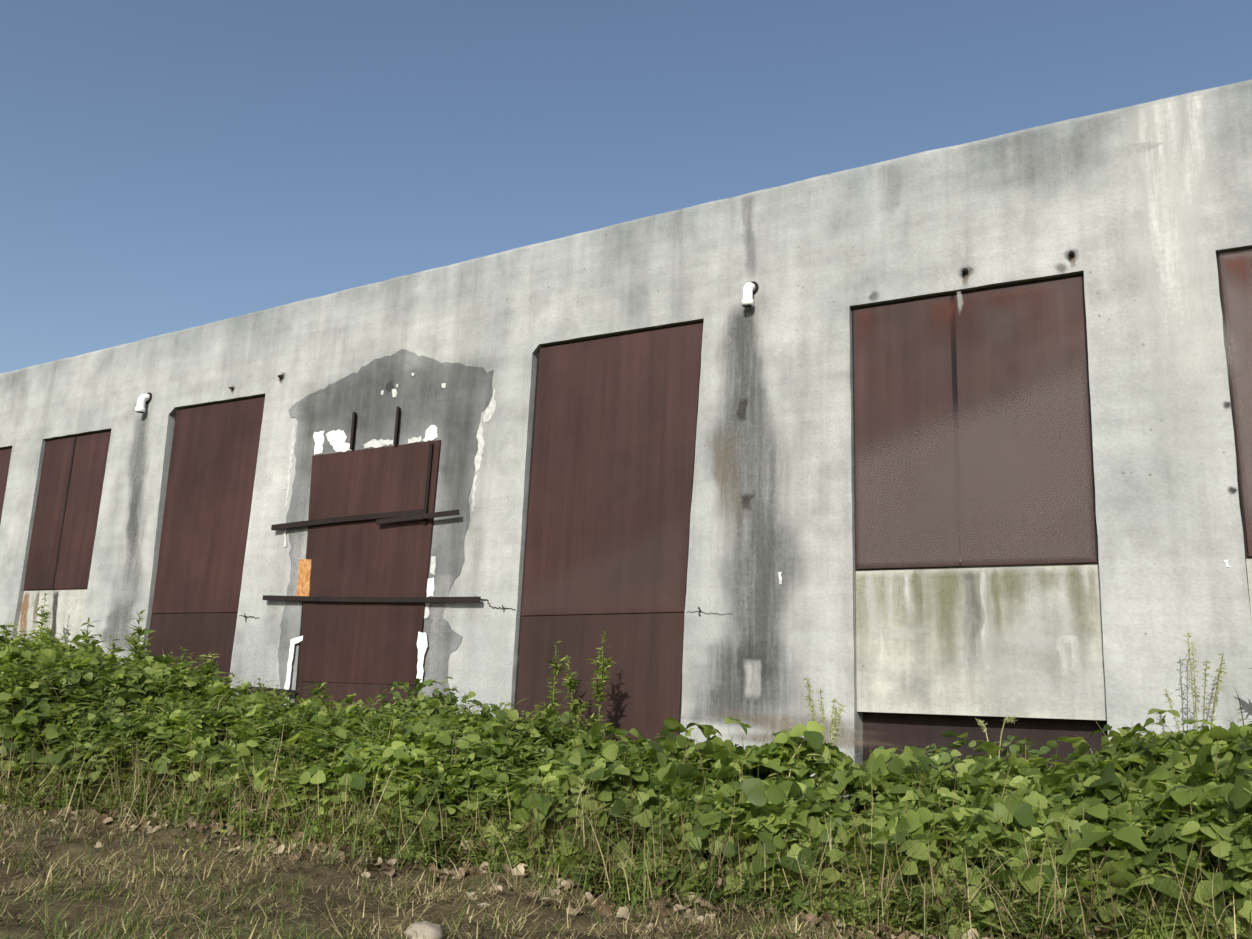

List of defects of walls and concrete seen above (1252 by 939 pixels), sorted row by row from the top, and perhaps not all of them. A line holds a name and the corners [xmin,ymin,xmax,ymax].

spalling [381,380,399,397]
spalling [285,425,296,509]
peeling [313,425,438,455]
spalling [471,388,496,512]
damp [711,310,788,737]
peeling [416,556,436,682]
damp [970,572,1005,645]
peeling [284,636,303,705]